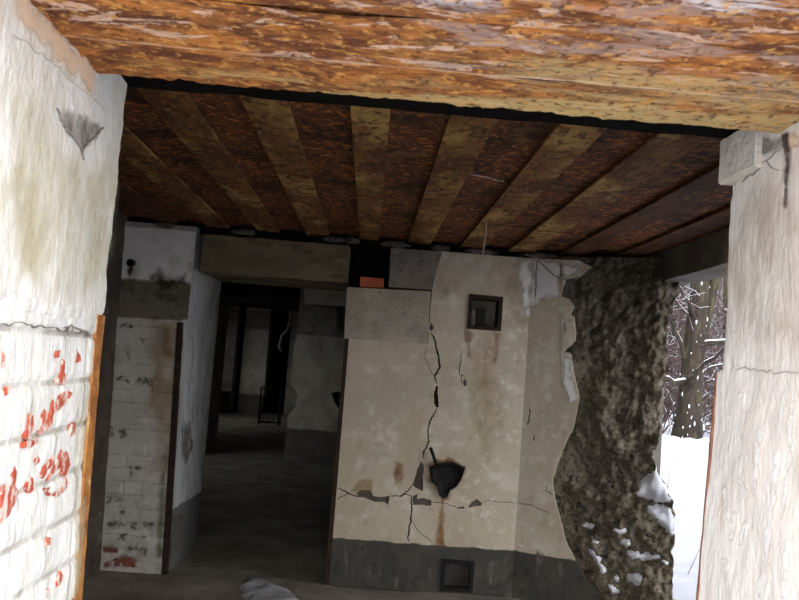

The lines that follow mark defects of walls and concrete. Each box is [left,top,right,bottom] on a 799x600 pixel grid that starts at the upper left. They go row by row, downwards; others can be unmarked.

damp [762,133,789,207]
damp [151,272,185,289]
crack [4,322,92,336]
crack [425,333,465,384]
spalling [0,350,81,524]
crack [422,408,437,459]
crack [394,485,432,542]
spalling [44,571,64,598]